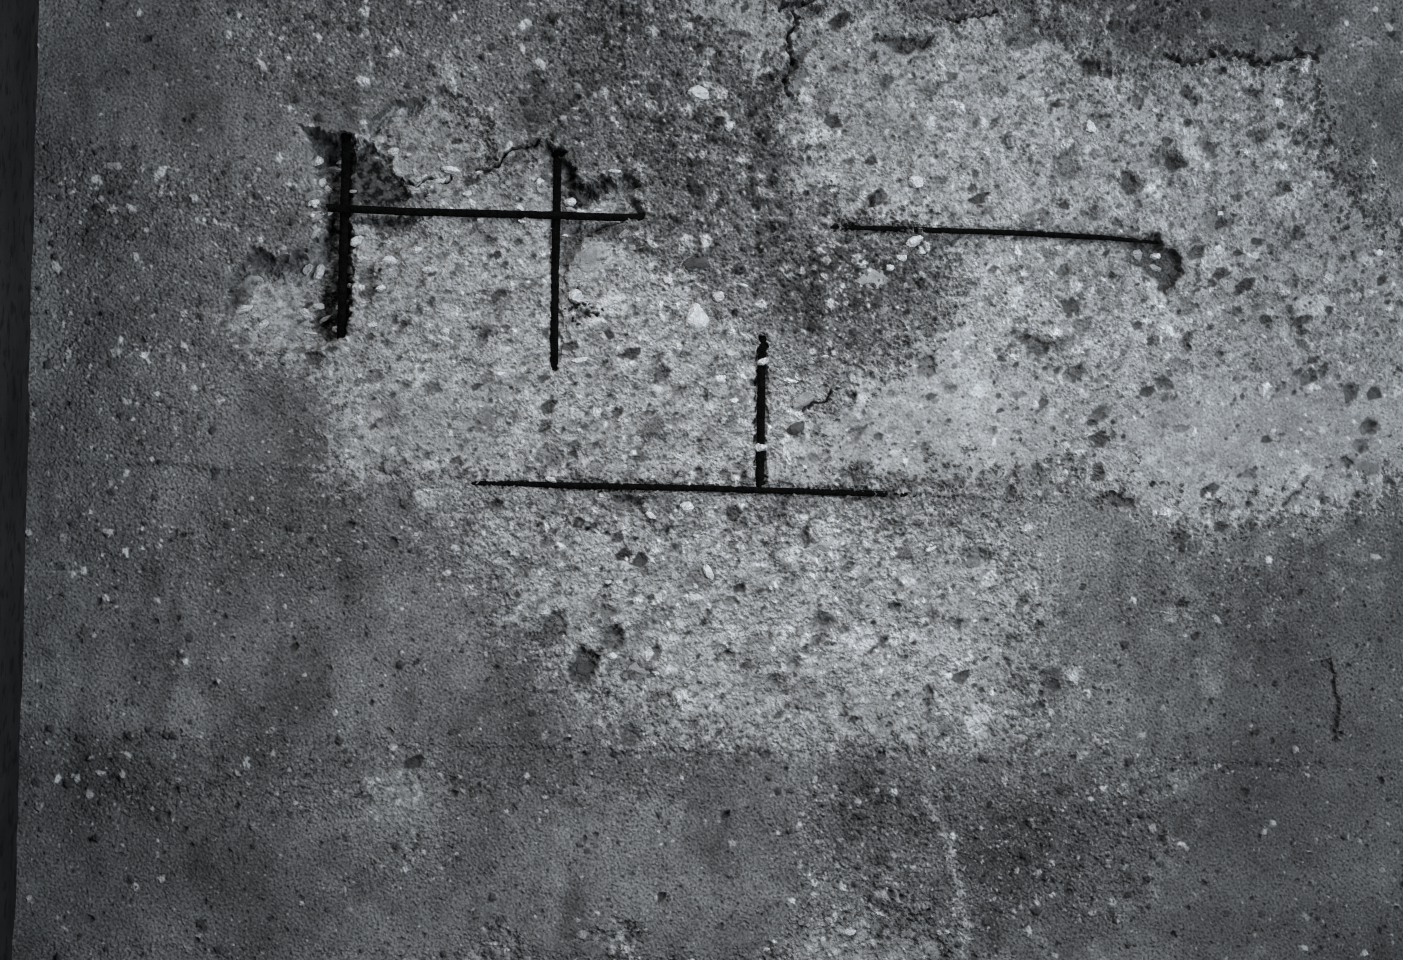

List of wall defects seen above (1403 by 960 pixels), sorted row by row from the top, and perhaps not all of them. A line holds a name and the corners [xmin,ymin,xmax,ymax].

crack [777,0,817,98]
crack [945,10,999,25]
crack [1162,44,1319,68]
crack [401,140,541,188]
spalling [185,0,1403,769]
spalling [345,733,479,859]